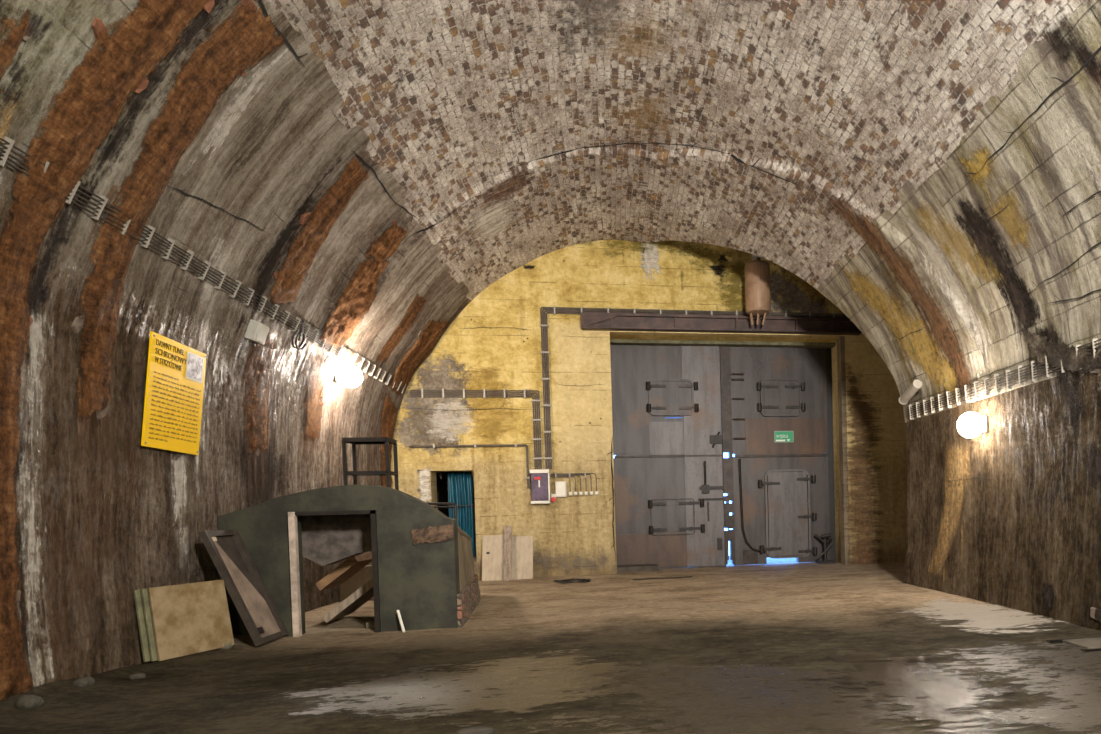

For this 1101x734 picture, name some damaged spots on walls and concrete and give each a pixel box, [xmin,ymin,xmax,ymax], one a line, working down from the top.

leakage [0,58,25,114]
leakage [1047,15,1101,93]
crack [522,142,814,193]
crack [1063,191,1101,216]
leakage [13,0,239,677]
rust [827,191,972,420]
leakage [902,215,991,351]
leakage [955,148,1062,364]
crack [1034,242,1101,306]
leakage [234,429,284,508]
leakage [1053,367,1101,493]